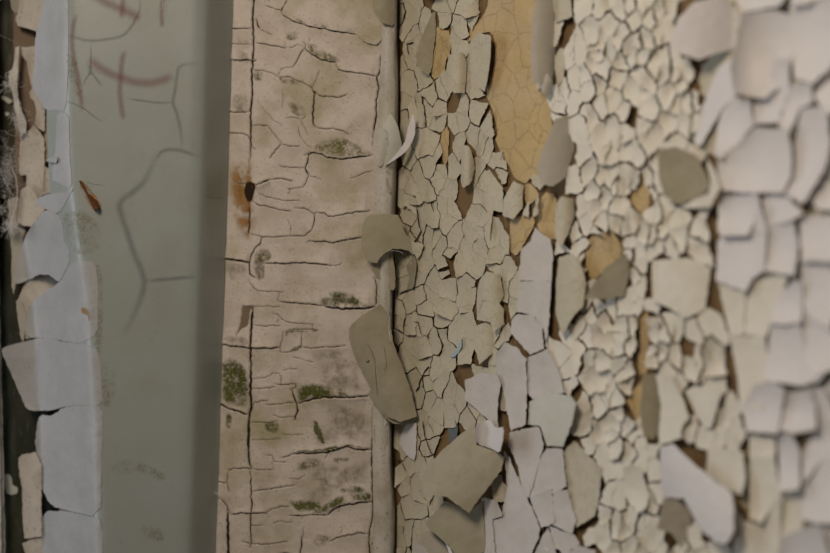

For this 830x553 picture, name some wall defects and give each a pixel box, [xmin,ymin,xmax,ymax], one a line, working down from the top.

peeling [2,0,103,553]
rust [233,171,253,226]
crack [218,0,524,553]
peeling [400,423,417,460]
peeling [421,0,623,553]
crack [522,174,543,217]
peeling [623,463,649,513]
peeling [627,0,830,553]